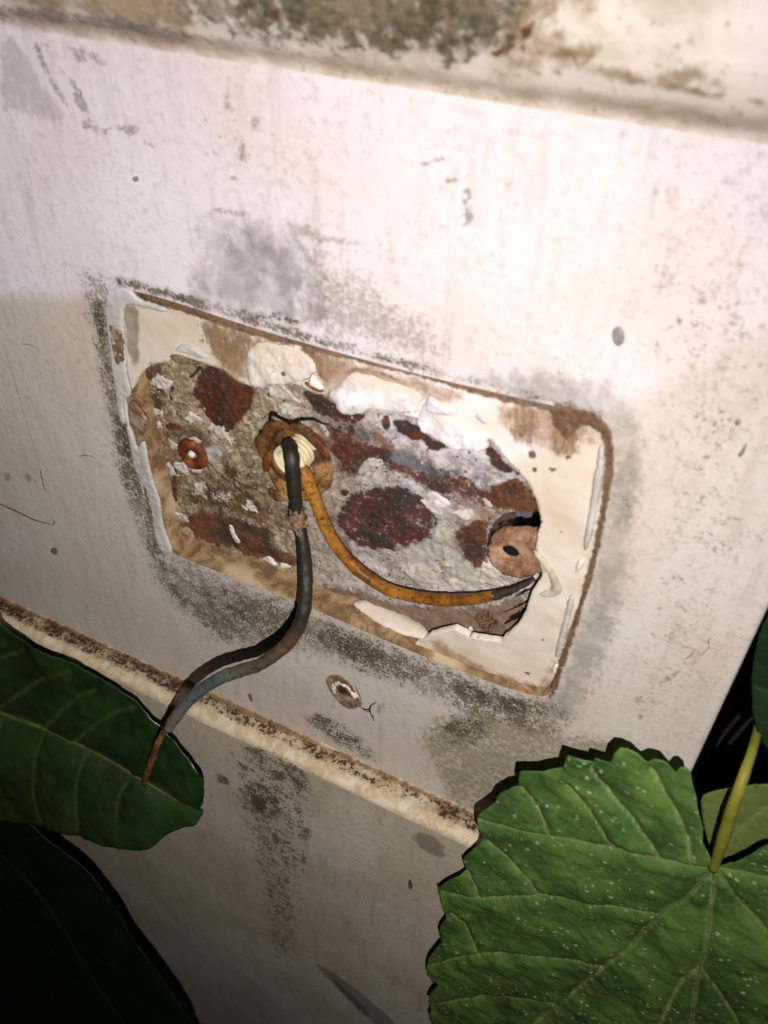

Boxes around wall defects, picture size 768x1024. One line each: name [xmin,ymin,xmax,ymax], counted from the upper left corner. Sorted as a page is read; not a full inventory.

corrosion [145,364,182,430]
peeling [170,344,208,365]
corrosion [189,366,254,432]
peeling [305,374,324,392]
leakage [116,230,600,472]
leakage [90,296,296,651]
peeling [211,469,237,502]
leakage [354,450,459,498]
corrosion [304,391,539,568]
corrosion [0,597,477,830]
hole [326,675,362,709]
leakage [304,620,572,736]